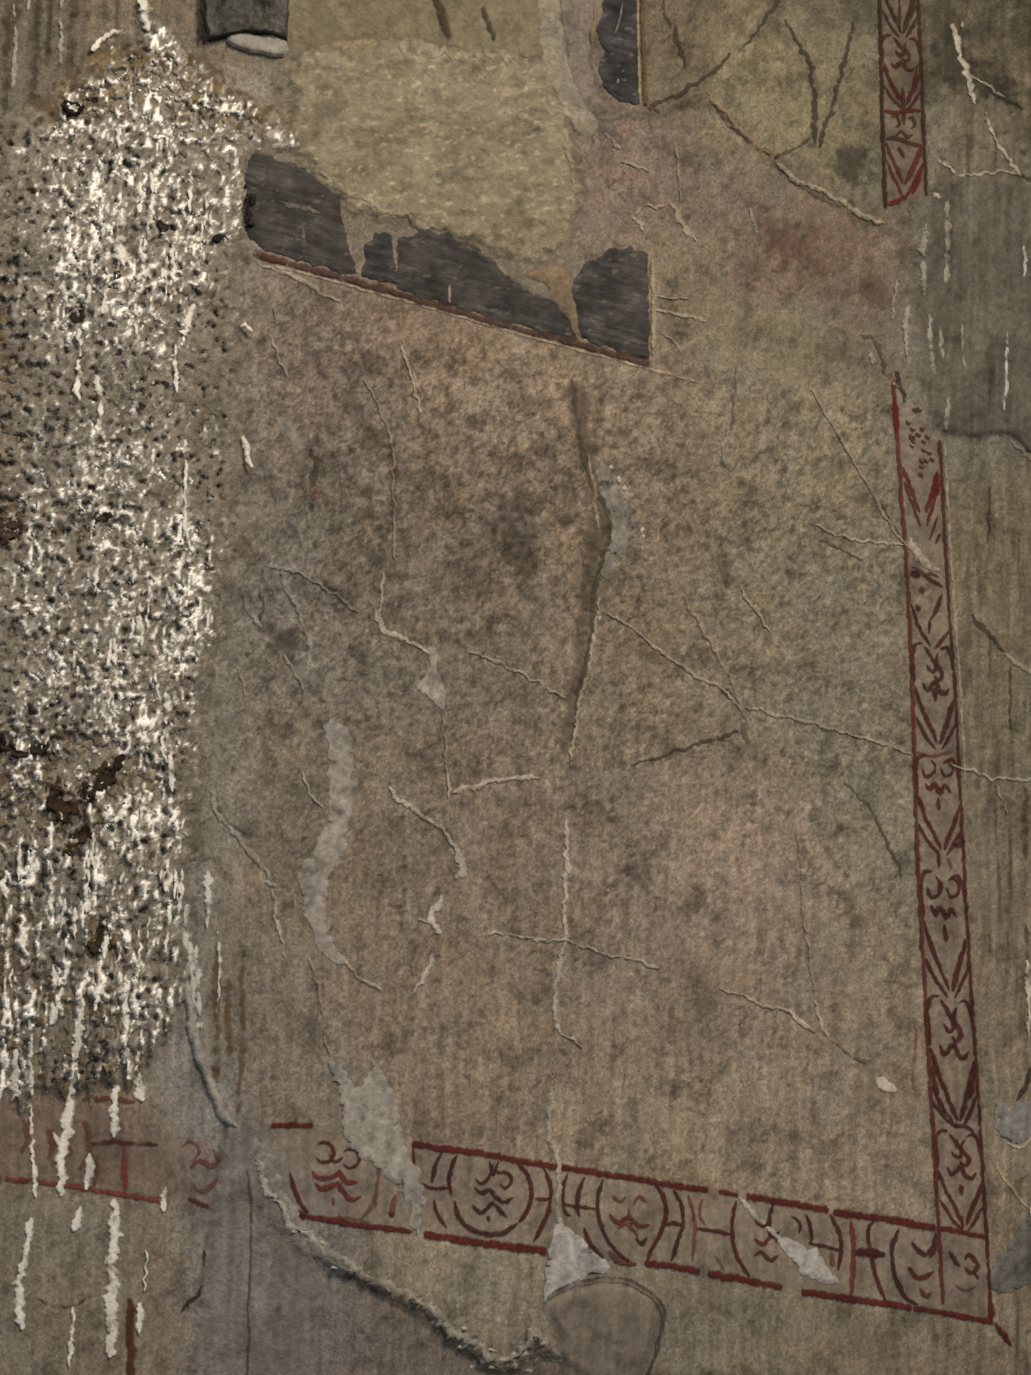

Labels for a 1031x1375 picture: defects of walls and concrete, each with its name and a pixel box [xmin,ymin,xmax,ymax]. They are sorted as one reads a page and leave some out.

crack [648,0,884,224]
crack [933,22,1031,199]
damp [0,0,300,1231]
crack [210,369,912,1063]
crack [490,820,660,1219]
peeling [329,1059,428,1234]
damp [12,1218,34,1330]
damp [68,1307,76,1367]
damp [103,1199,124,1358]
damp [136,1250,148,1333]
flaking render [253,1138,563,1375]
peeling [543,1209,611,1302]